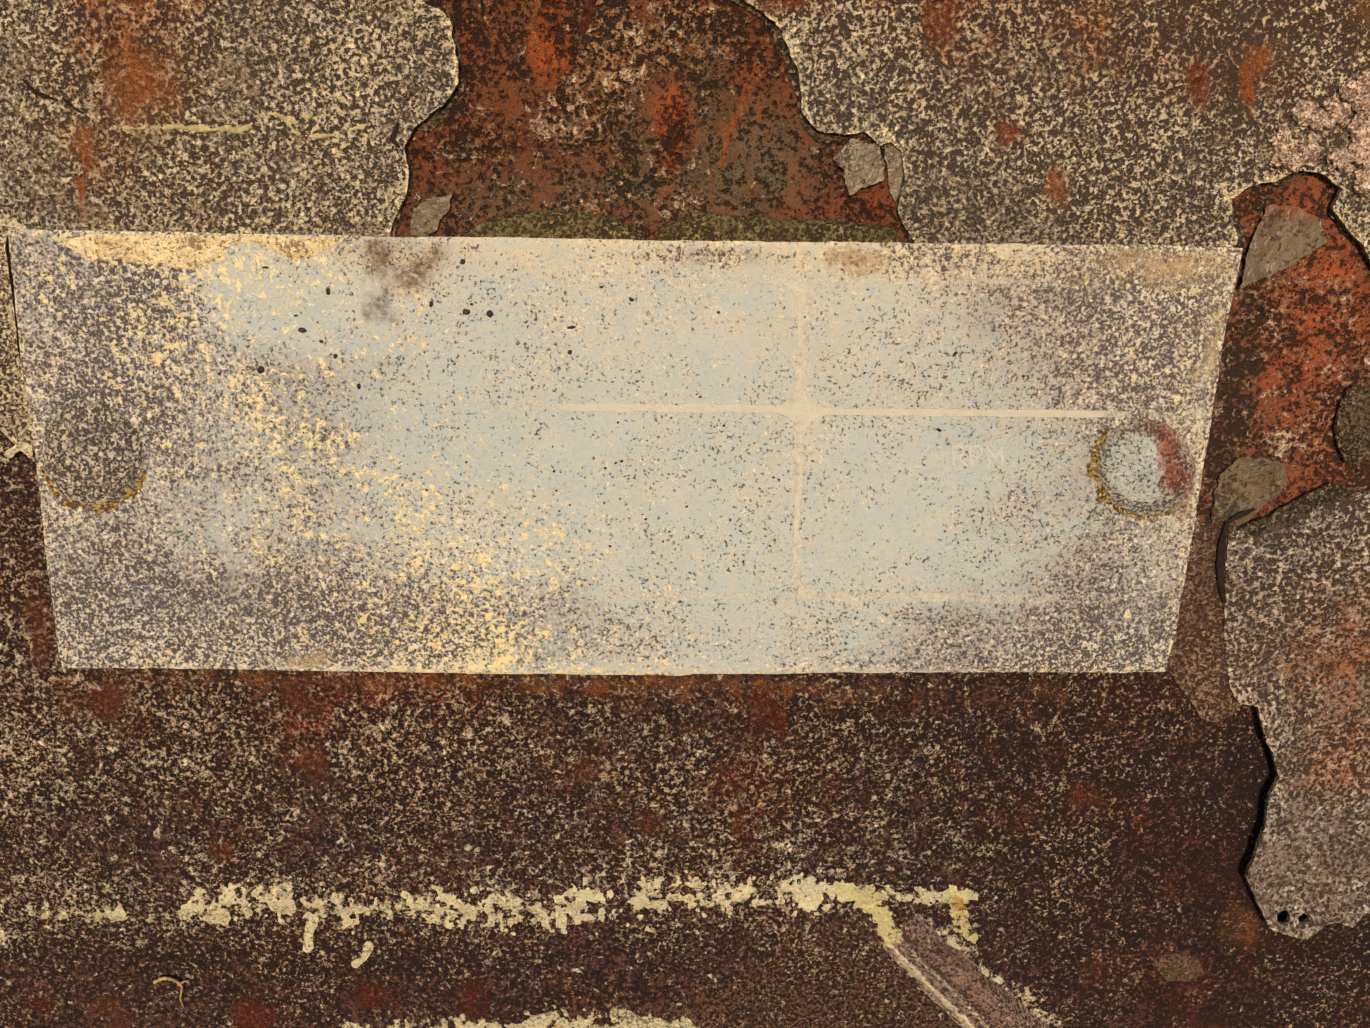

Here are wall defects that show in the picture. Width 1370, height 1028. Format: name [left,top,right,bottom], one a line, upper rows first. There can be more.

corrosion [924,0,962,45]
corrosion [108,31,174,113]
spalling [391,0,914,243]
corrosion [996,123,1021,143]
peeling [1195,171,1370,940]